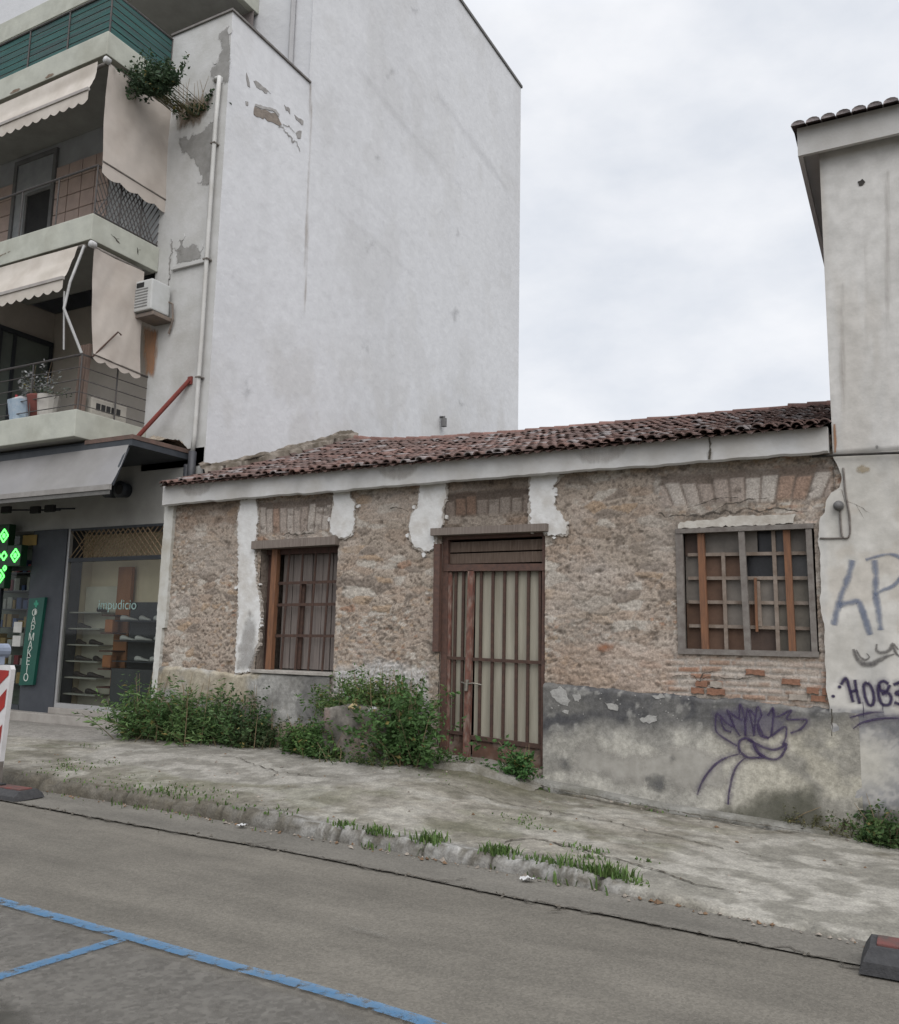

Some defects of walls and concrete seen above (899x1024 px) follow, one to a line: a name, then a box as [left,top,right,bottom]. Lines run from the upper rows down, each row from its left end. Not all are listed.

peeling [210,26,233,84]
spalling [245,73,304,139]
peeling [179,115,214,185]
peeling [176,233,204,263]
peeling [327,491,361,540]
peeling [405,483,449,558]
peeling [527,474,570,539]
peeling [234,498,264,675]
peeling [550,686,581,714]
peeling [638,694,682,724]
spalling [781,678,827,702]
water stain [721,792,823,827]